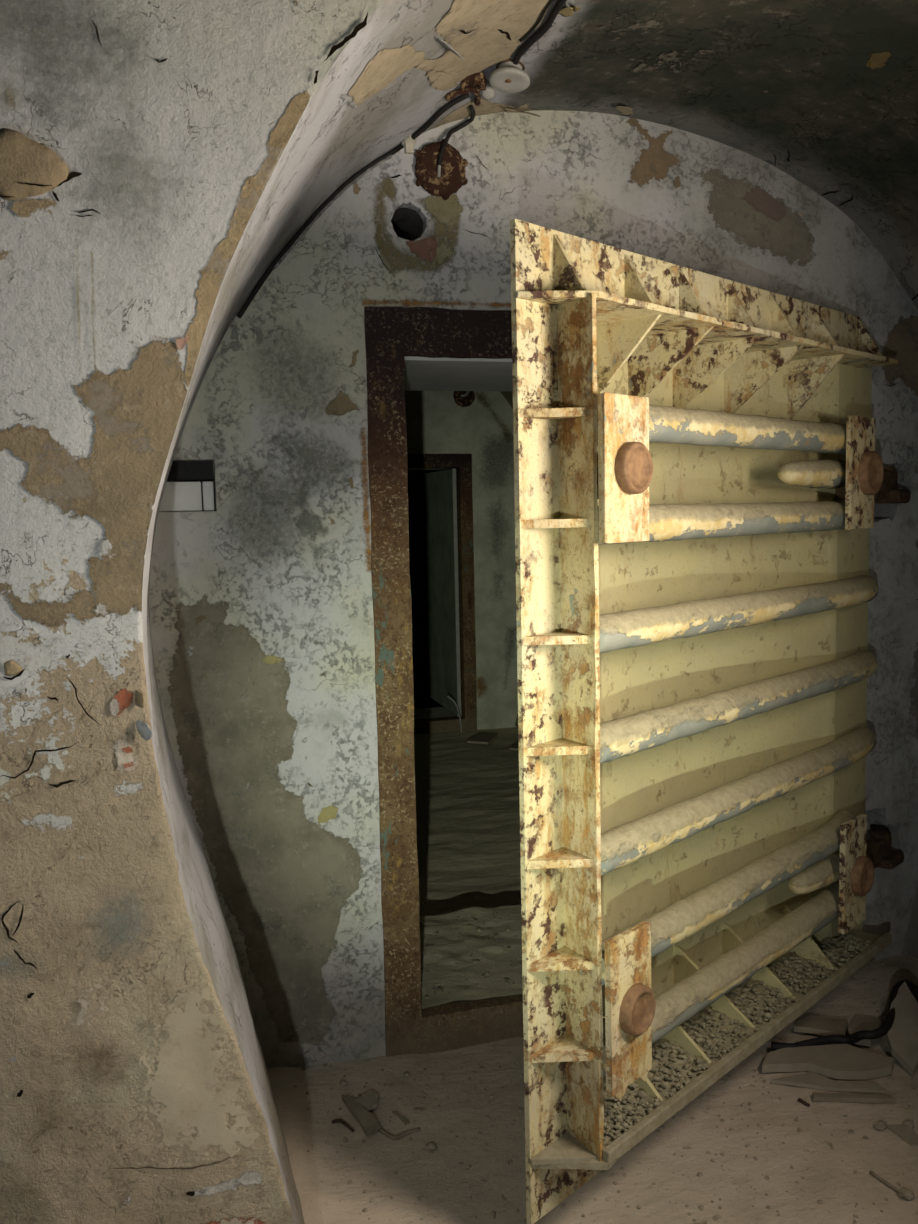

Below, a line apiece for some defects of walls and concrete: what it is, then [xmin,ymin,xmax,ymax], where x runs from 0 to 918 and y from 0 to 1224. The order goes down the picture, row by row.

peeling [340,0,580,109]
peeling [615,106,686,188]
peeling [373,175,463,277]
peeling [697,167,816,272]
peeling [0,91,310,629]
peeling [325,390,360,416]
peeling [882,314,918,397]
corrosion [361,431,371,570]
crack [2,654,103,788]
flaking render [109,689,154,772]
peeling [168,594,363,1046]
crack [1,901,37,969]